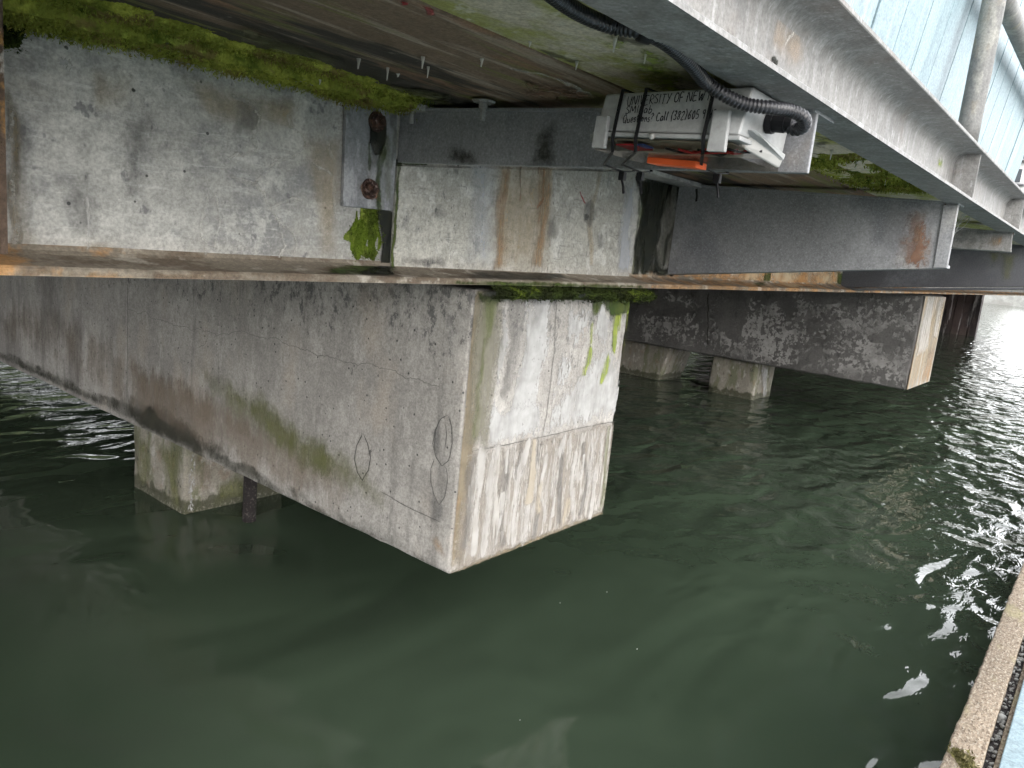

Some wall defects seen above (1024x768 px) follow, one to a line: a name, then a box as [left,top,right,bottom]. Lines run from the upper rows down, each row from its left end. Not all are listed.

rust [903,212,930,268]
water stain [2,356,119,410]
water stain [131,405,271,488]
water stain [451,291,629,566]